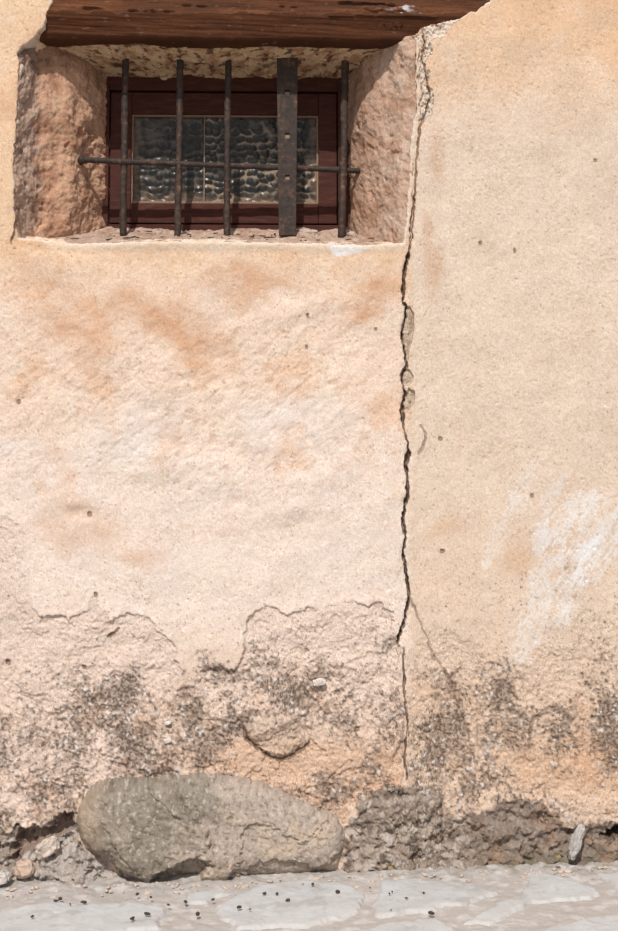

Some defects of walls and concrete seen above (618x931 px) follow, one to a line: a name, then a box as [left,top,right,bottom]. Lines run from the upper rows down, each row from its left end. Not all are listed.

spalling [414,18,461,125]
crack [396,28,478,780]
flaking render [0,513,618,885]